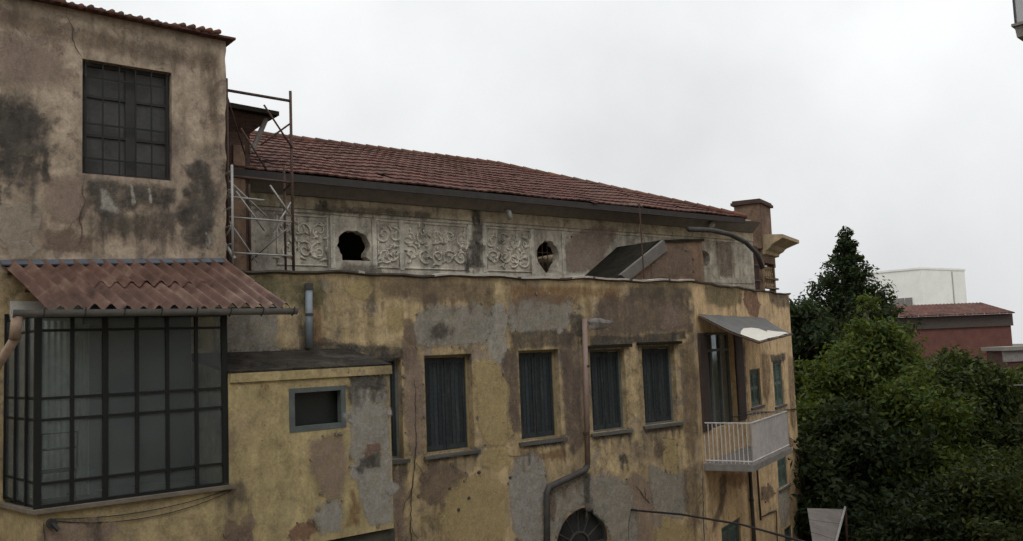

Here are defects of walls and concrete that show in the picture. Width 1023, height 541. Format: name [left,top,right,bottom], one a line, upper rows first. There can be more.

leakage [0,94,58,207]
leakage [88,160,218,259]
leakage [465,210,485,271]
flaking render [343,374,399,529]
crack [403,380,425,541]
flaking render [507,453,654,541]